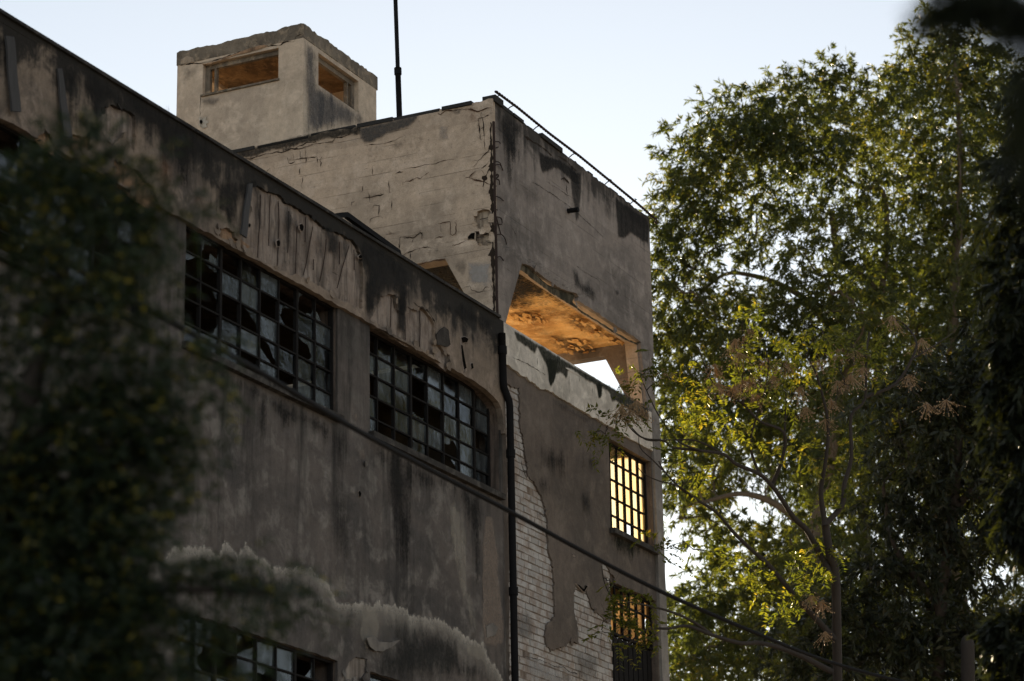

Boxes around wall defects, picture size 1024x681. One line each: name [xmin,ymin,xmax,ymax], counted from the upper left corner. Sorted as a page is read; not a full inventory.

water stain [237,51,417,157]
crack [438,107,491,185]
water stain [503,120,520,172]
water stain [219,181,261,225]
crack [246,134,468,265]
water stain [540,153,581,219]
water stain [616,198,649,242]
water stain [362,244,407,330]
water stain [515,332,648,421]
peeling [483,385,613,681]
flaking render [342,636,400,681]